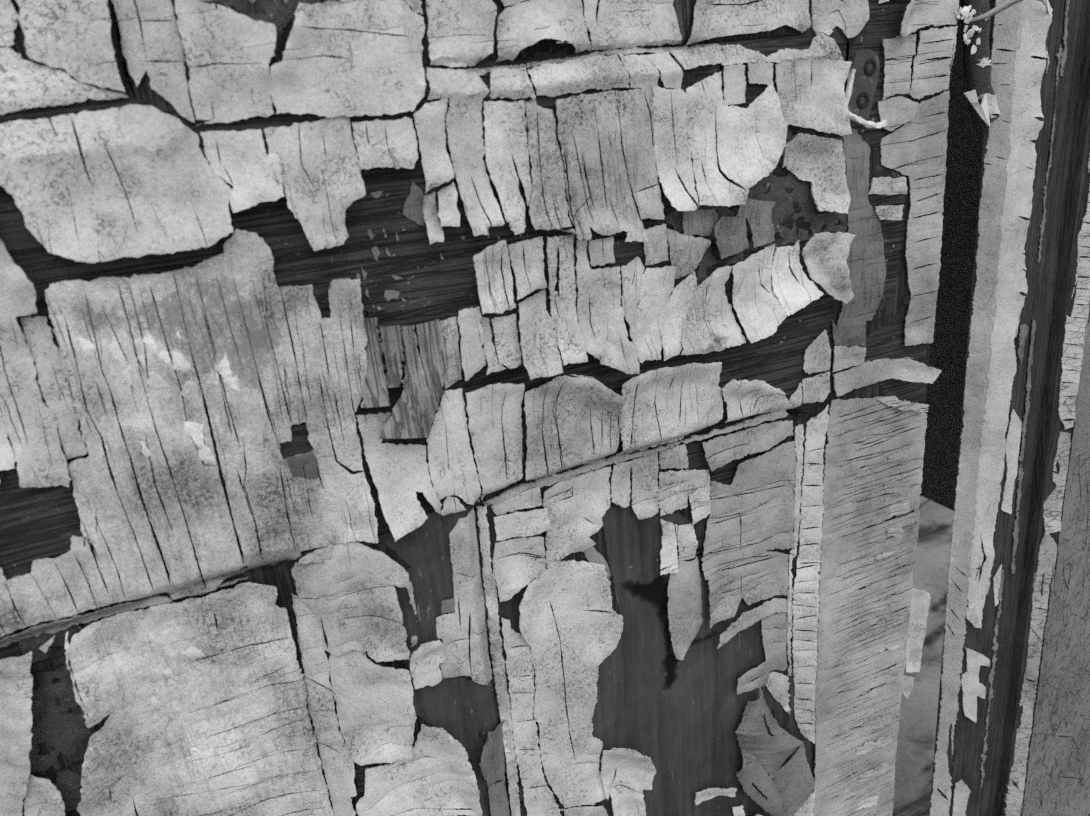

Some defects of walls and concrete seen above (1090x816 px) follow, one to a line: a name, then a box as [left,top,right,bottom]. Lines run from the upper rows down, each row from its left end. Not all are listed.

crack [46,115,166,235]
crack [261,133,269,155]
peeling [0,0,959,578]
crack [498,158,524,207]
crack [842,112,944,355]
peeling [1037,0,1070,265]
crack [37,515,125,609]
peeling [0,228,830,816]
crack [658,449,914,724]
peeling [867,588,931,700]
peeling [952,318,1036,816]
peeling [1004,153,1090,816]